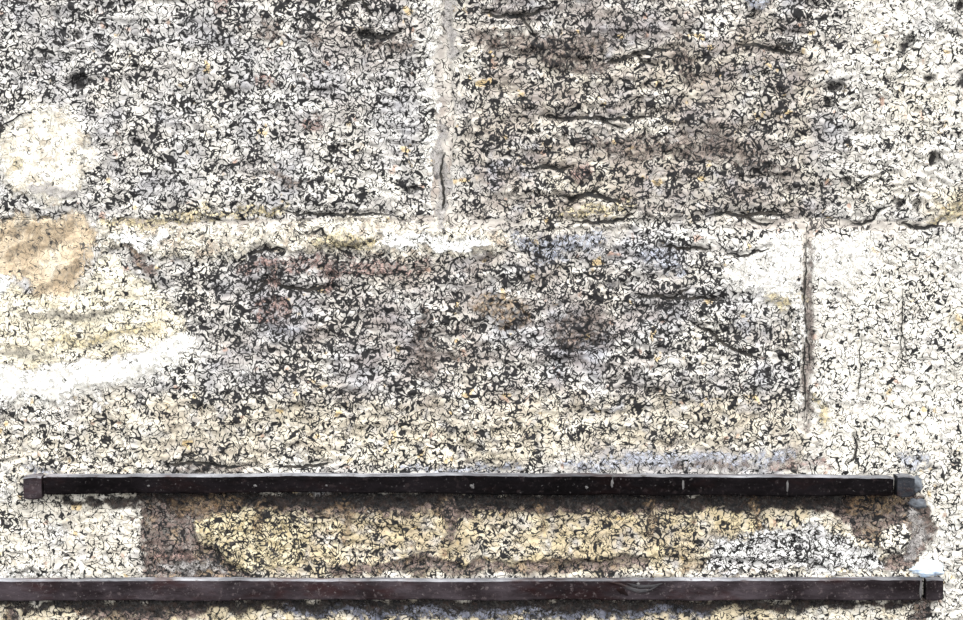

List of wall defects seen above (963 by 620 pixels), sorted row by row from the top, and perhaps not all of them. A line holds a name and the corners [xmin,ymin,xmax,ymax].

crack [438,157,446,209]
crack [802,236,810,423]